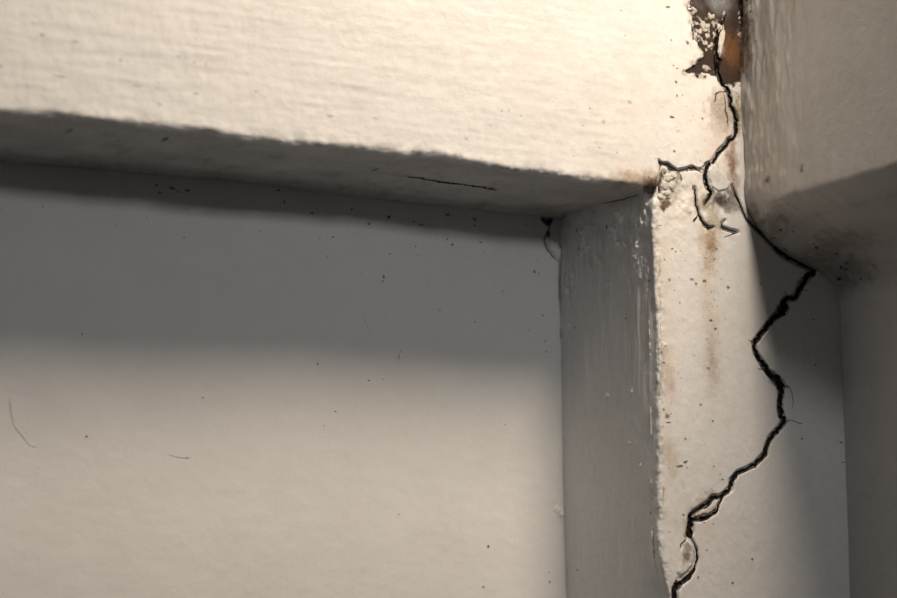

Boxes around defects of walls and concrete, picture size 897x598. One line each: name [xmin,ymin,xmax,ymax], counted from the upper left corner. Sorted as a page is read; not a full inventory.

spalling [686,0,749,87]
crack [658,13,816,598]